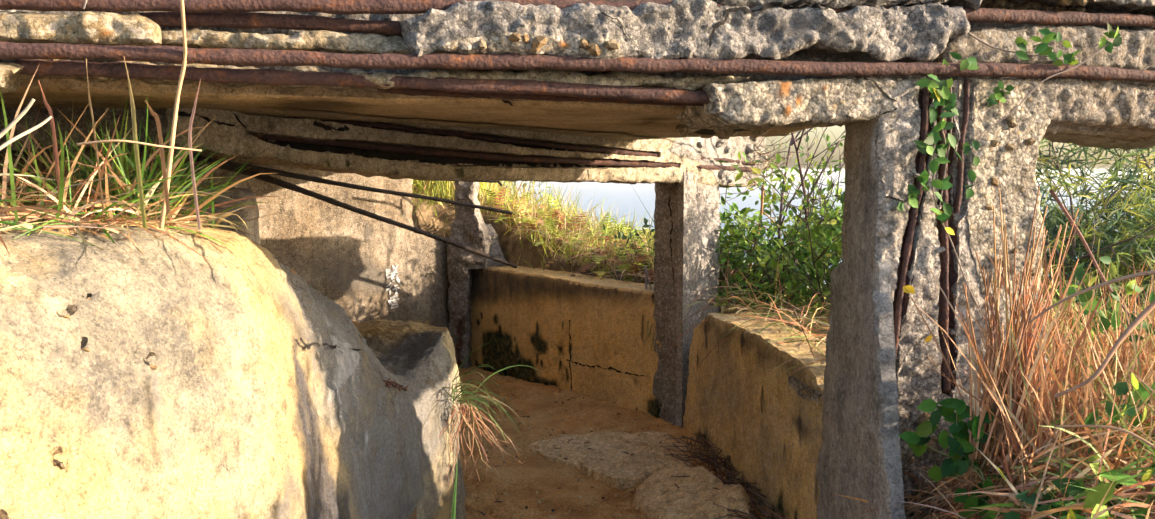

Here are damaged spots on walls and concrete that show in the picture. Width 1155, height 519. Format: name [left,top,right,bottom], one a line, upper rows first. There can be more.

crack [709,0,835,48]
crack [865,0,944,8]
spalling [979,0,1103,13]
spalling [418,32,623,59]
corrosion [780,80,801,115]
leakage [471,269,633,301]
leakage [475,313,572,387]
crack [566,320,644,391]